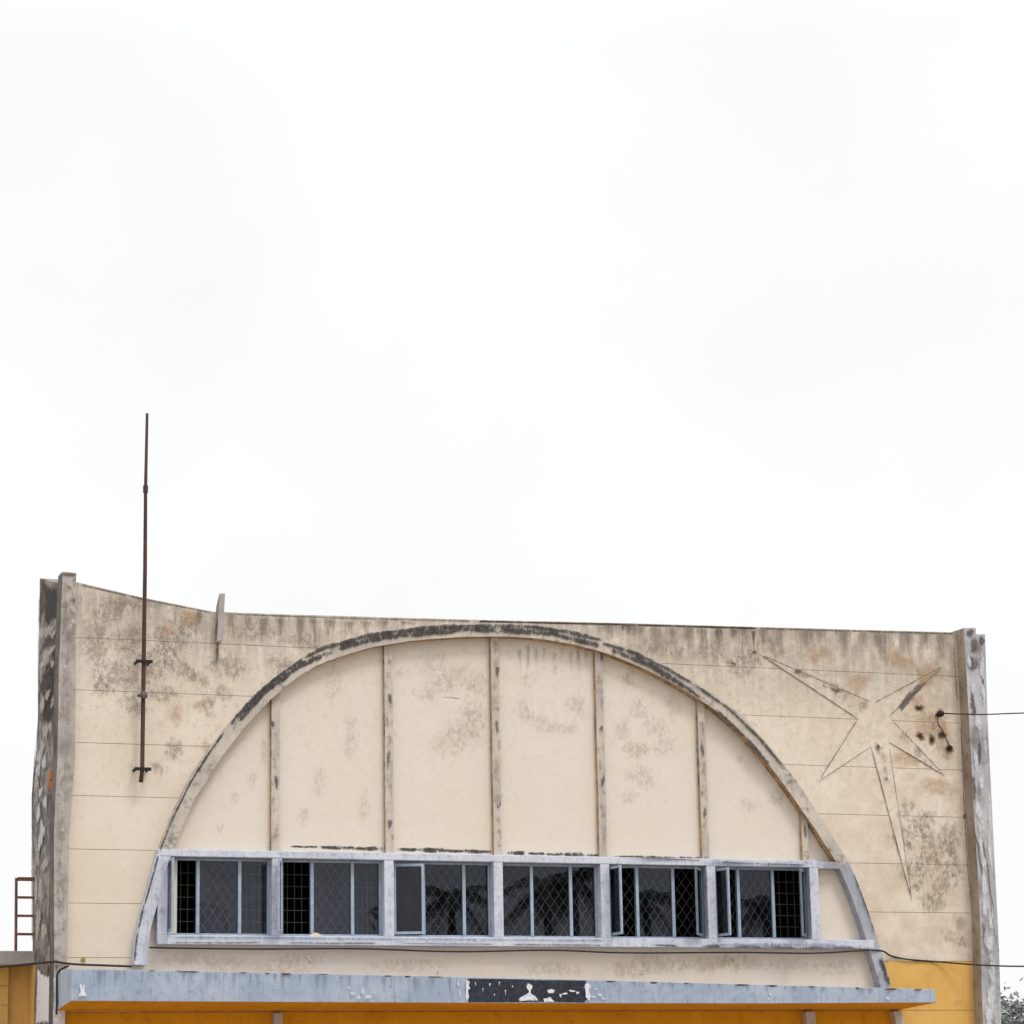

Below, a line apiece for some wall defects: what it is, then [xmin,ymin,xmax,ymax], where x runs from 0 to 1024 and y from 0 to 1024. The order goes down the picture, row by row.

damp [84,585,206,620]
spalling [39,626,68,668]
peeling [34,690,64,939]
damp [134,614,953,960]
peeling [974,715,986,789]
peeling [976,802,995,1024]
damp [879,959,897,990]